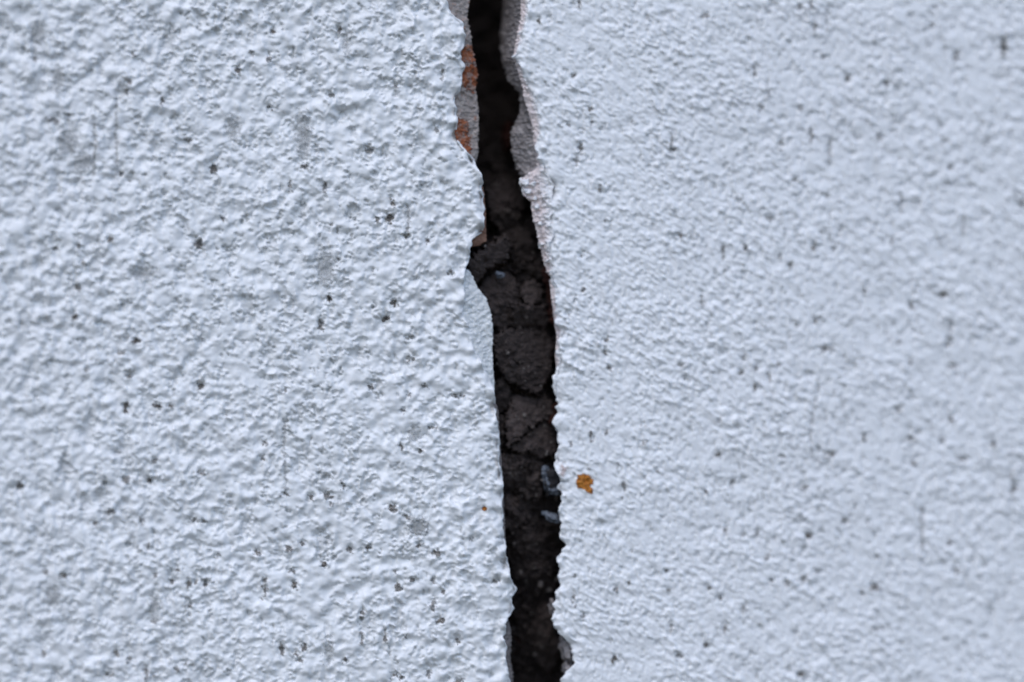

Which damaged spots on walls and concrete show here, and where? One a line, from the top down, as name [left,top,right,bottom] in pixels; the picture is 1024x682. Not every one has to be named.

spalling [447,0,479,162]
spalling [472,187,487,247]
crack [453,0,575,682]
spalling [499,0,563,391]